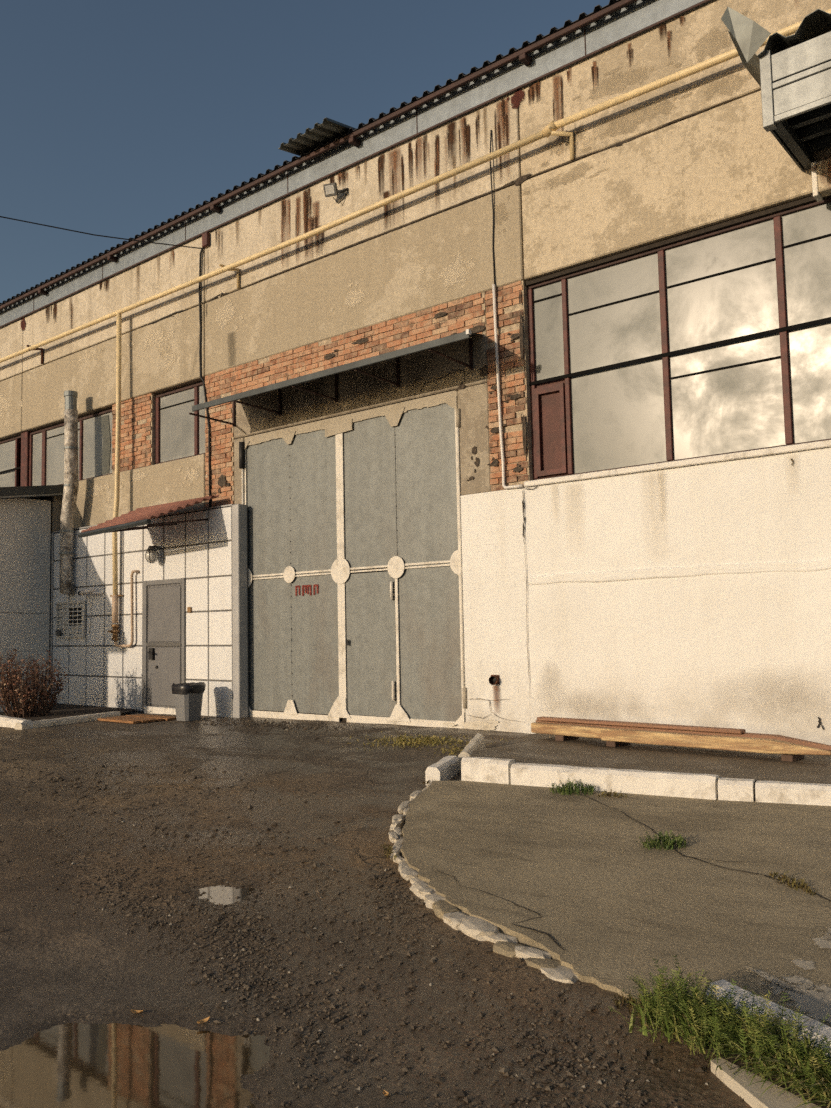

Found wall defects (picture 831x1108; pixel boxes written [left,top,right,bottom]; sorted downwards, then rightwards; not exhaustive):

corrosion [528,82,540,103]
corrosion [553,68,570,129]
corrosion [330,99,508,219]
corrosion [282,188,324,244]
peeling [178,467,229,493]
crack [580,794,831,902]
crack [436,870,565,951]
peeling [812,928,831,948]
peeling [746,959,831,1023]